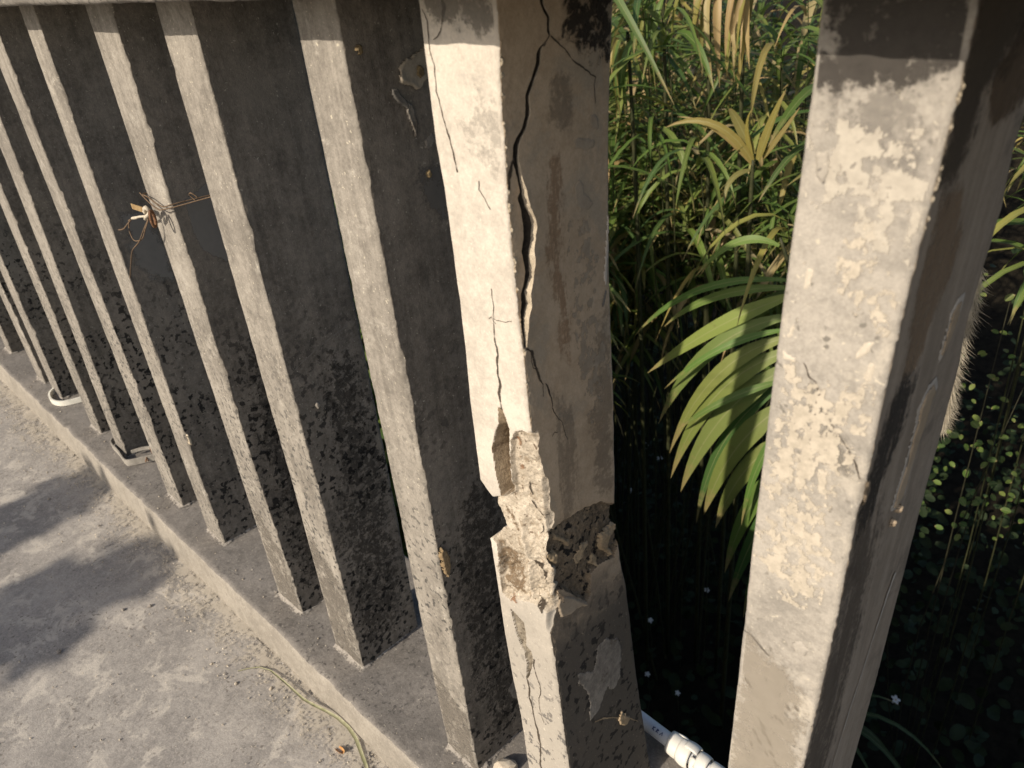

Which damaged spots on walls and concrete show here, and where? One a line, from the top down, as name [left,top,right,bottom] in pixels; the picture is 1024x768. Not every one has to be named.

peeling [391,47,434,149]
crack [422,0,596,439]
peeling [753,118,954,610]
crack [527,659,544,768]
spalling [492,407,618,680]
peeling [578,637,621,721]